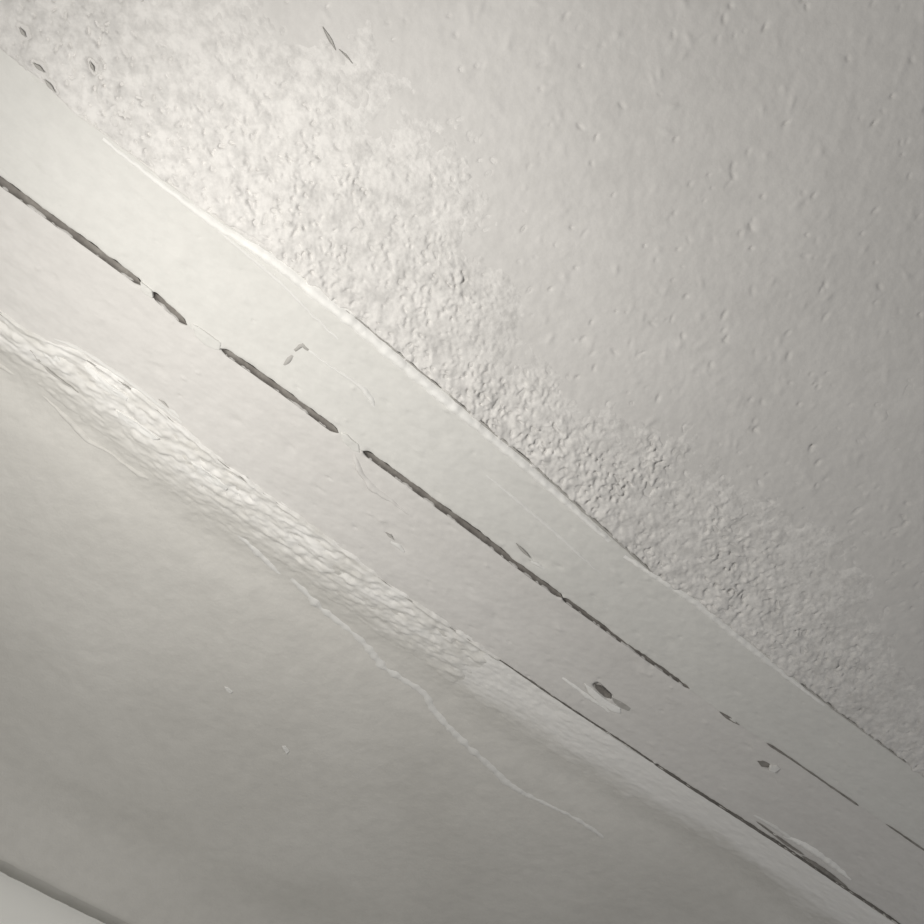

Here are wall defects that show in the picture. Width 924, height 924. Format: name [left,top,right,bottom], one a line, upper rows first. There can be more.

crack [0,176,187,325]
crack [221,349,338,433]
crack [348,312,652,572]
crack [363,451,689,689]
crack [238,535,604,838]
peeling [562,678,631,713]
crack [499,660,905,924]
peeling [753,815,851,888]
crack [886,824,924,851]